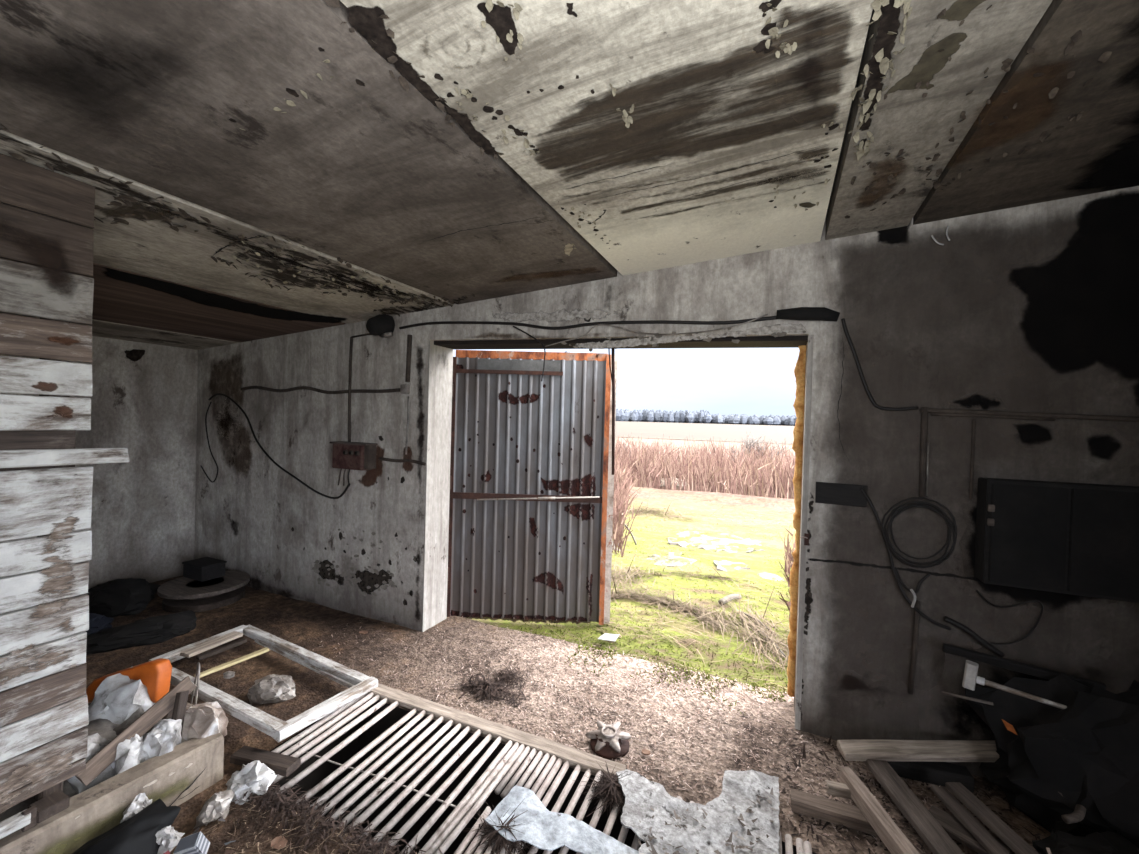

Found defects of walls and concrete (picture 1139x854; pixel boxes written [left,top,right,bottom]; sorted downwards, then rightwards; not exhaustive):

peeling [753,0,782,53]
peeling [273,88,307,113]
spalling [325,0,539,160]
leakage [536,3,852,204]
peeling [821,0,992,211]
peeling [94,195,192,232]
leakage [621,148,829,218]
peeling [211,235,475,317]
rust [358,446,384,487]
peeling [0,513,80,688]
peeling [311,529,416,605]